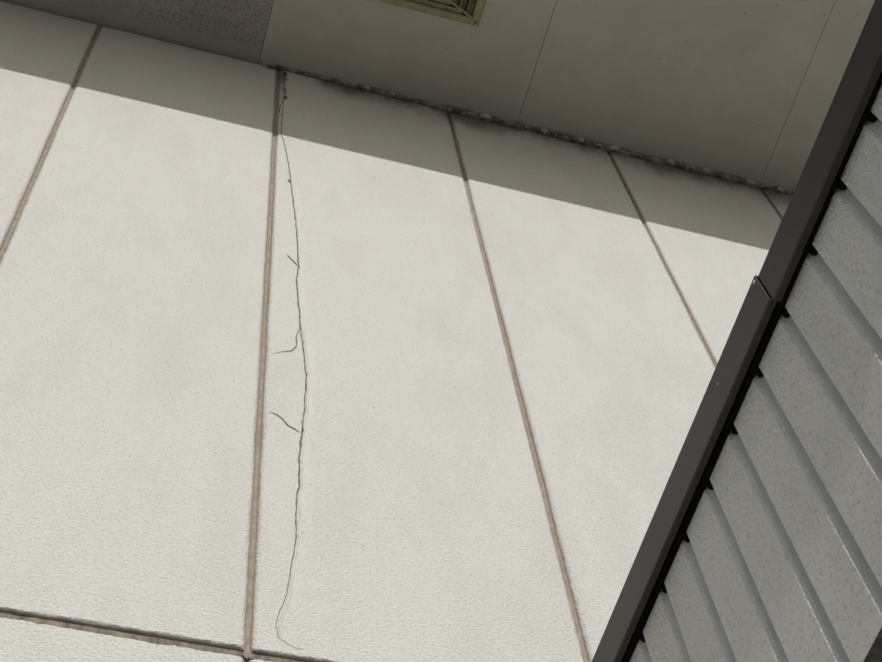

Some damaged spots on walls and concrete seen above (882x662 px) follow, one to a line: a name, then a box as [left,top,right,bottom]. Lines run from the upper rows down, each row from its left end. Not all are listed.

crack [271,74,310,649]